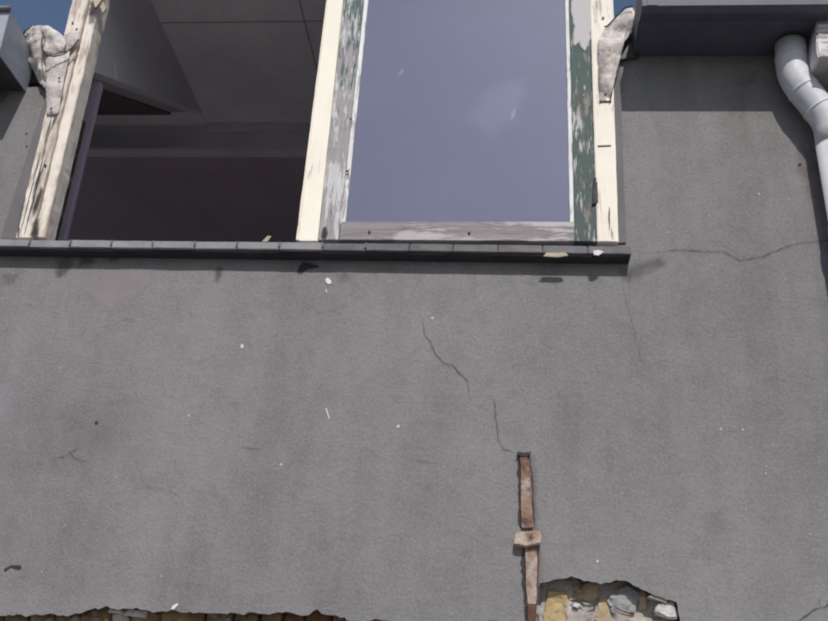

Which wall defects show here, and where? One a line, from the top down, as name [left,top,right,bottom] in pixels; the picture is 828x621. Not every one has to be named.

flaking render [0,608,348,621]
flaking render [534,577,678,621]